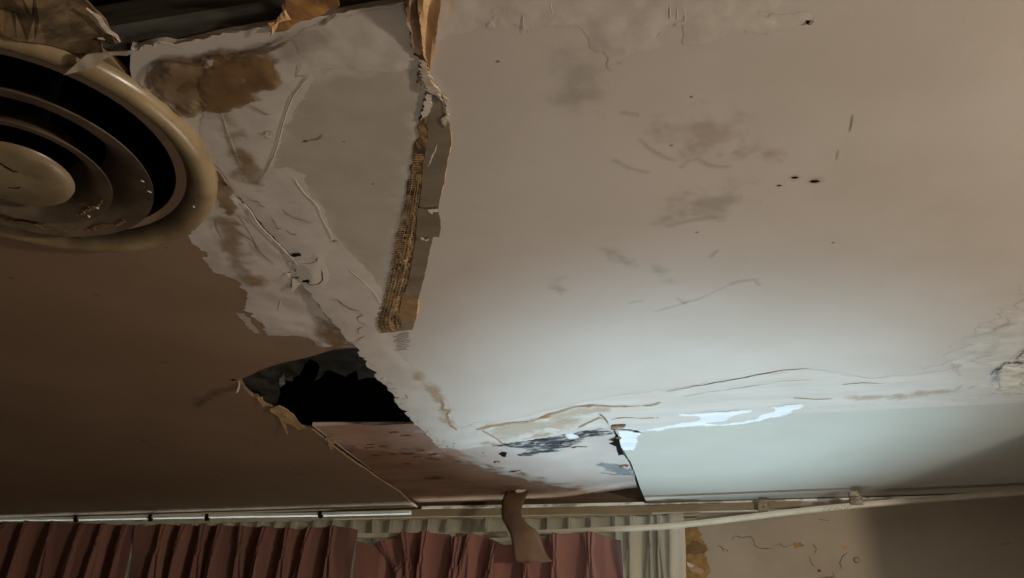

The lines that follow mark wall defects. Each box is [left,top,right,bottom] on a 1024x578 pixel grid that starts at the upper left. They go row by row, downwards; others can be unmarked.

water stain [146,40,289,118]
water stain [316,424,612,504]
water stain [597,463,631,475]